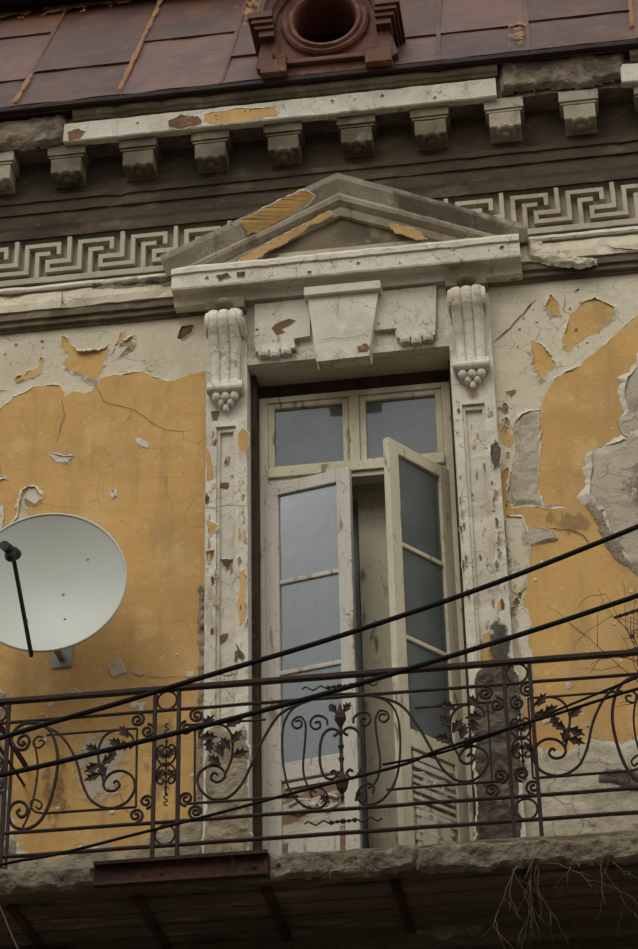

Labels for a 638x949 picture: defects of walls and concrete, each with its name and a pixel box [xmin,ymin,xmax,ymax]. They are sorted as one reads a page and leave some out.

rust [117,0,162,89]
rust [12,73,32,102]
peeling [167,105,279,130]
peeling [67,128,86,141]
peeling [205,189,333,282]
peeling [176,323,196,341]
peeling [0,330,254,895]